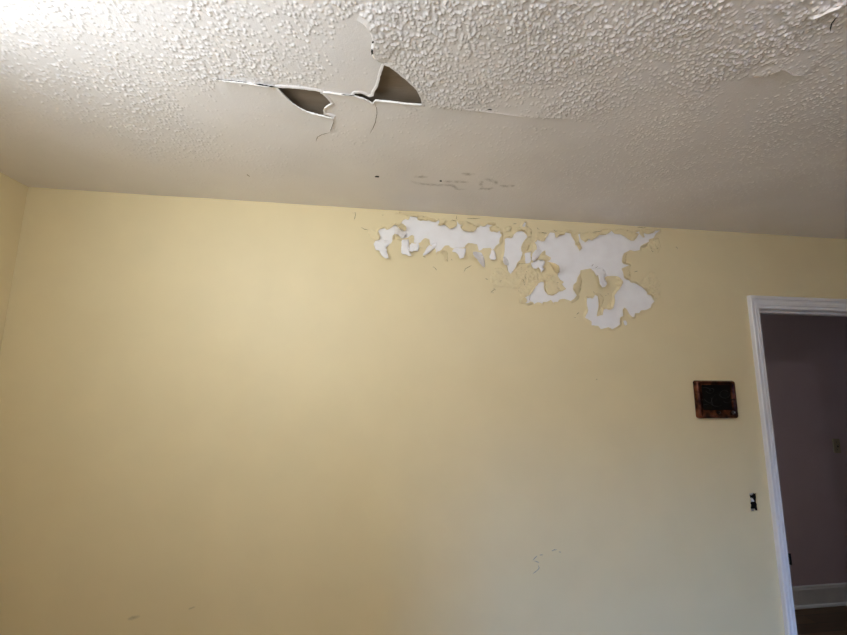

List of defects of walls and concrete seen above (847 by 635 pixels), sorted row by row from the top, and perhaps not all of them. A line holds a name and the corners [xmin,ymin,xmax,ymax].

crack [217,79,278,89]
crack [320,90,354,98]
peeling [363,212,661,331]